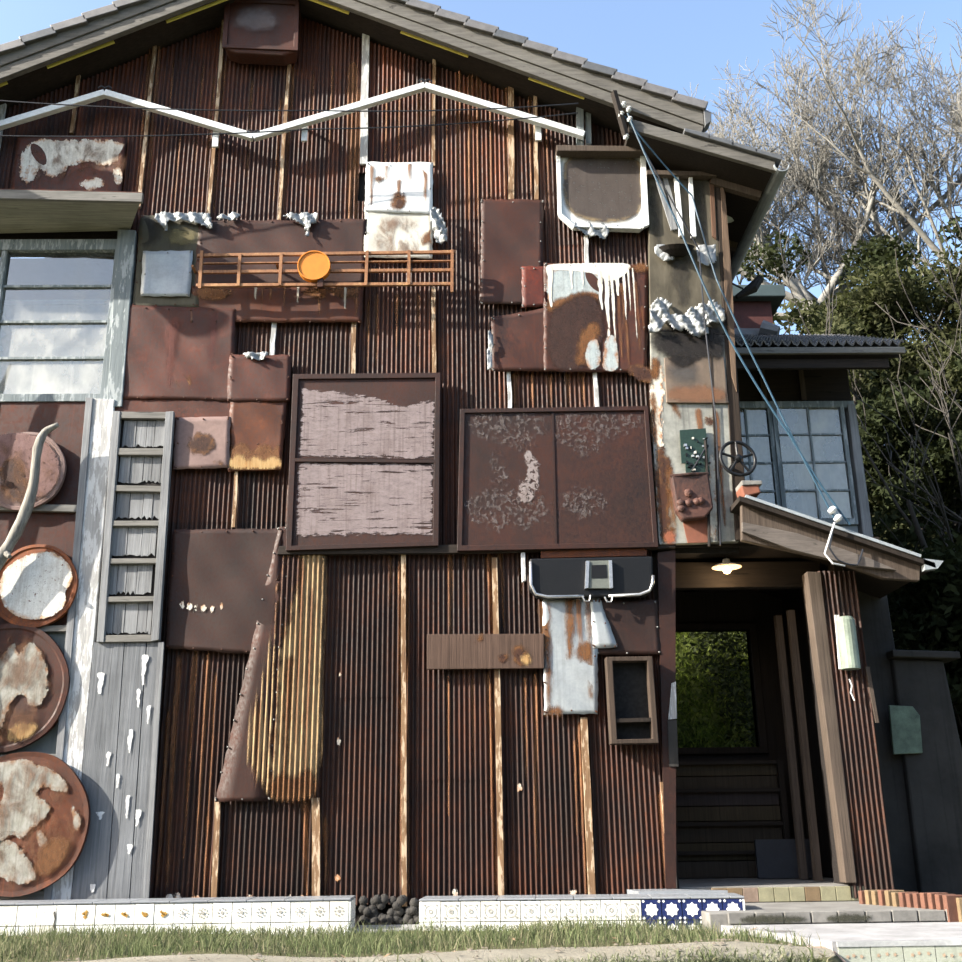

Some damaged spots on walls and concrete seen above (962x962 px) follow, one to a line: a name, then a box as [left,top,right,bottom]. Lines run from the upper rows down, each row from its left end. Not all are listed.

peeling [19,138,124,191]
corrosion [347,62,411,219]
damp [563,157,660,244]
damp [695,180,705,244]
damp [668,261,690,304]
corrosion [546,292,605,406]
corrosion [218,443,281,470]
peeling [296,388,435,537]
corrosion [565,599,592,666]
peeling [137,654,151,724]
corrosion [248,555,324,896]
peeling [125,795,141,826]